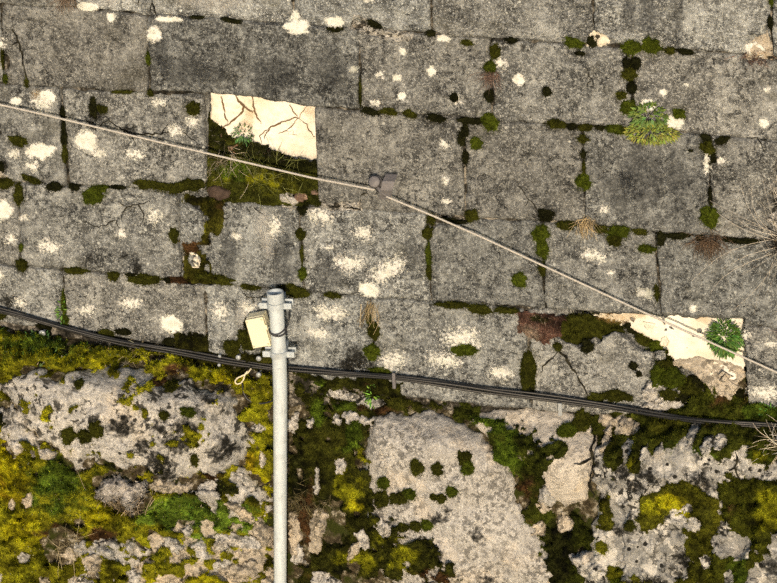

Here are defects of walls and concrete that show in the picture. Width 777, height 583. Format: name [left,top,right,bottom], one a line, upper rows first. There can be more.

spalling [210,93,317,162]
crack [221,95,315,140]
crack [540,337,588,396]
spalling [594,313,746,401]